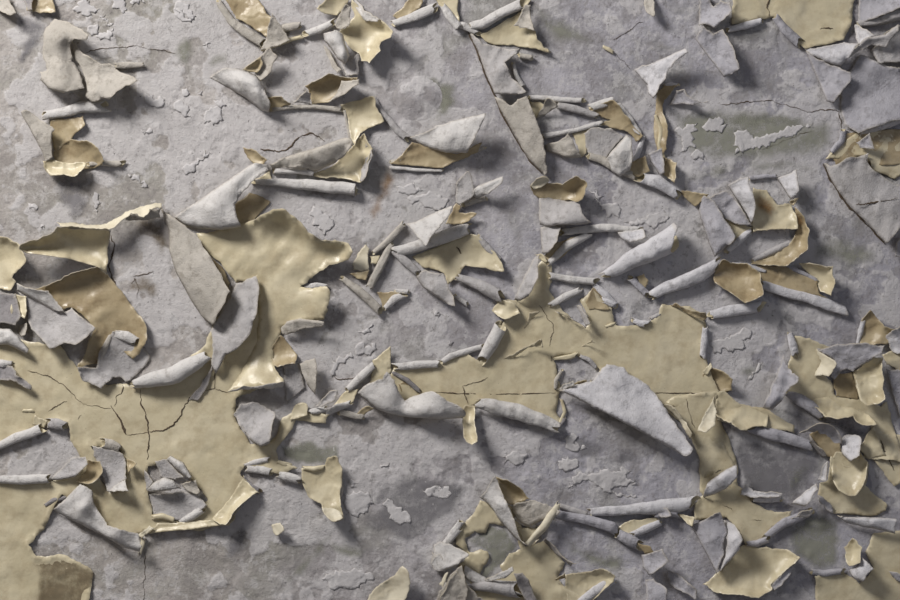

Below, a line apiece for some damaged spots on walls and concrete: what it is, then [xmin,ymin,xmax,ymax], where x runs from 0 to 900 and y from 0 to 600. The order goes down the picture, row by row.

crack [261,132,324,152]
crack [722,100,842,150]
peeling [696,0,900,257]
peeling [0,0,849,449]
crack [27,370,228,460]
peeling [0,402,411,556]
flaking render [424,486,452,499]
crack [442,379,540,403]
peeling [480,310,900,600]
peeling [431,519,537,600]